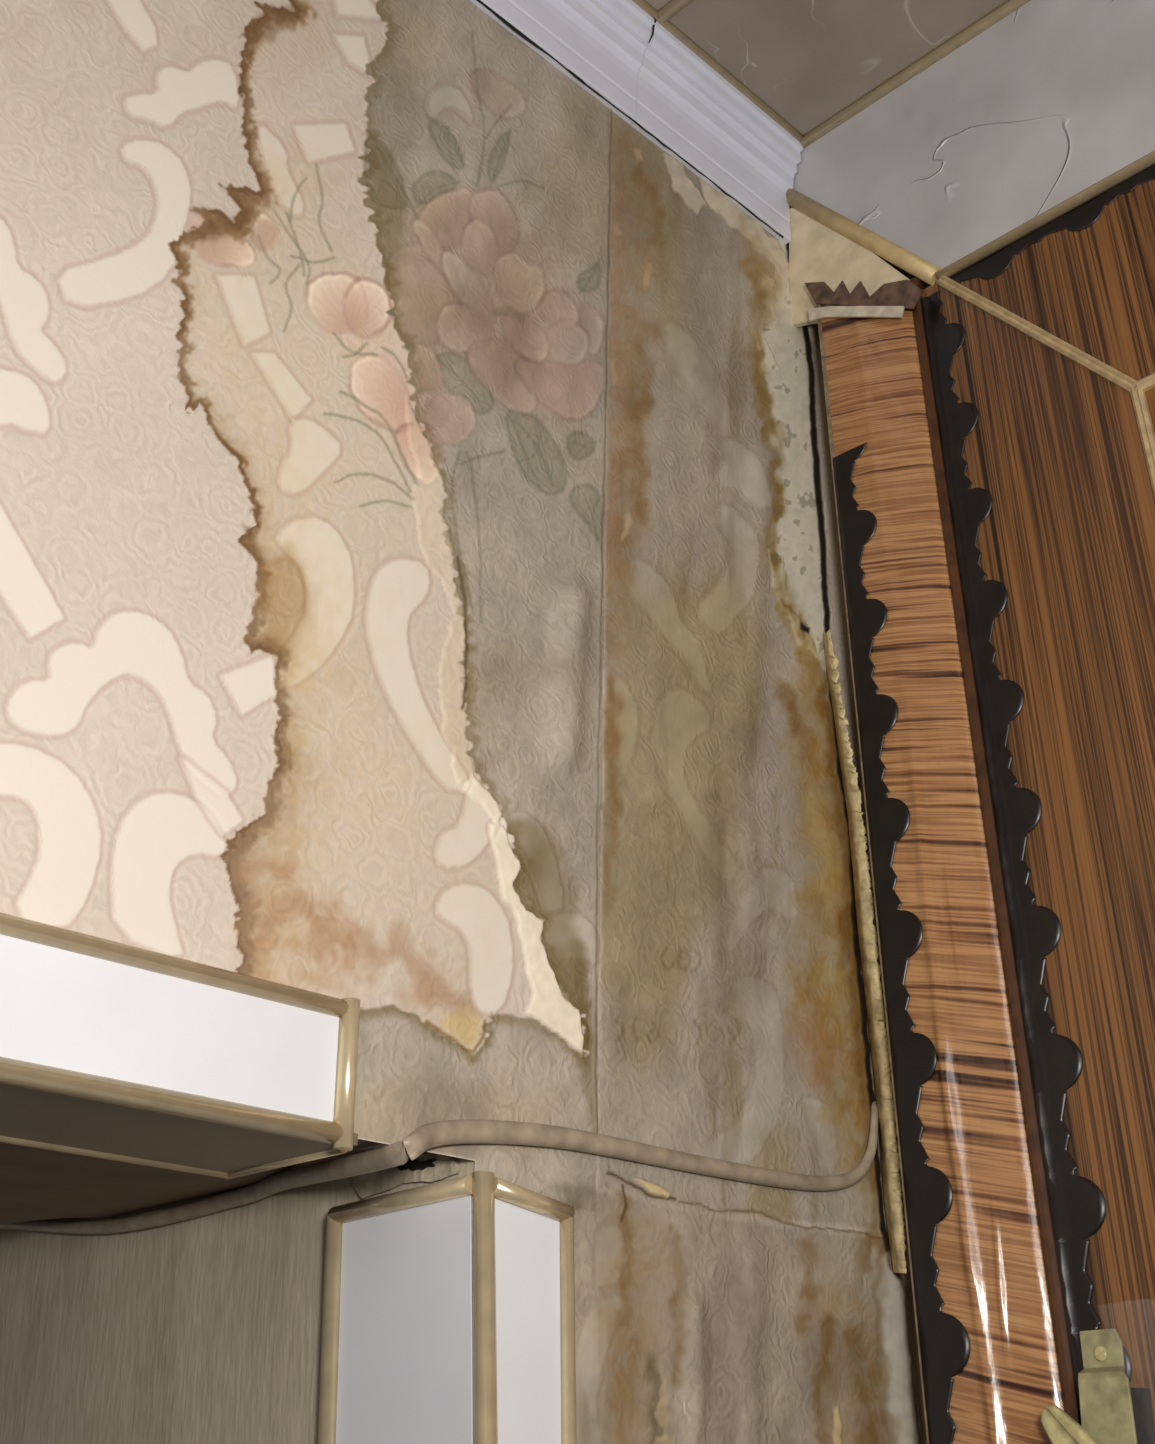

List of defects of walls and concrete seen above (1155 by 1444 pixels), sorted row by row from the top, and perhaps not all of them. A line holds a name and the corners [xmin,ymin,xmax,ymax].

peeling [403,389,503,823]
leakage [166,0,887,1444]
spalling [662,151,835,659]
peeling [832,1404,844,1444]
leakage [905,1273,924,1444]